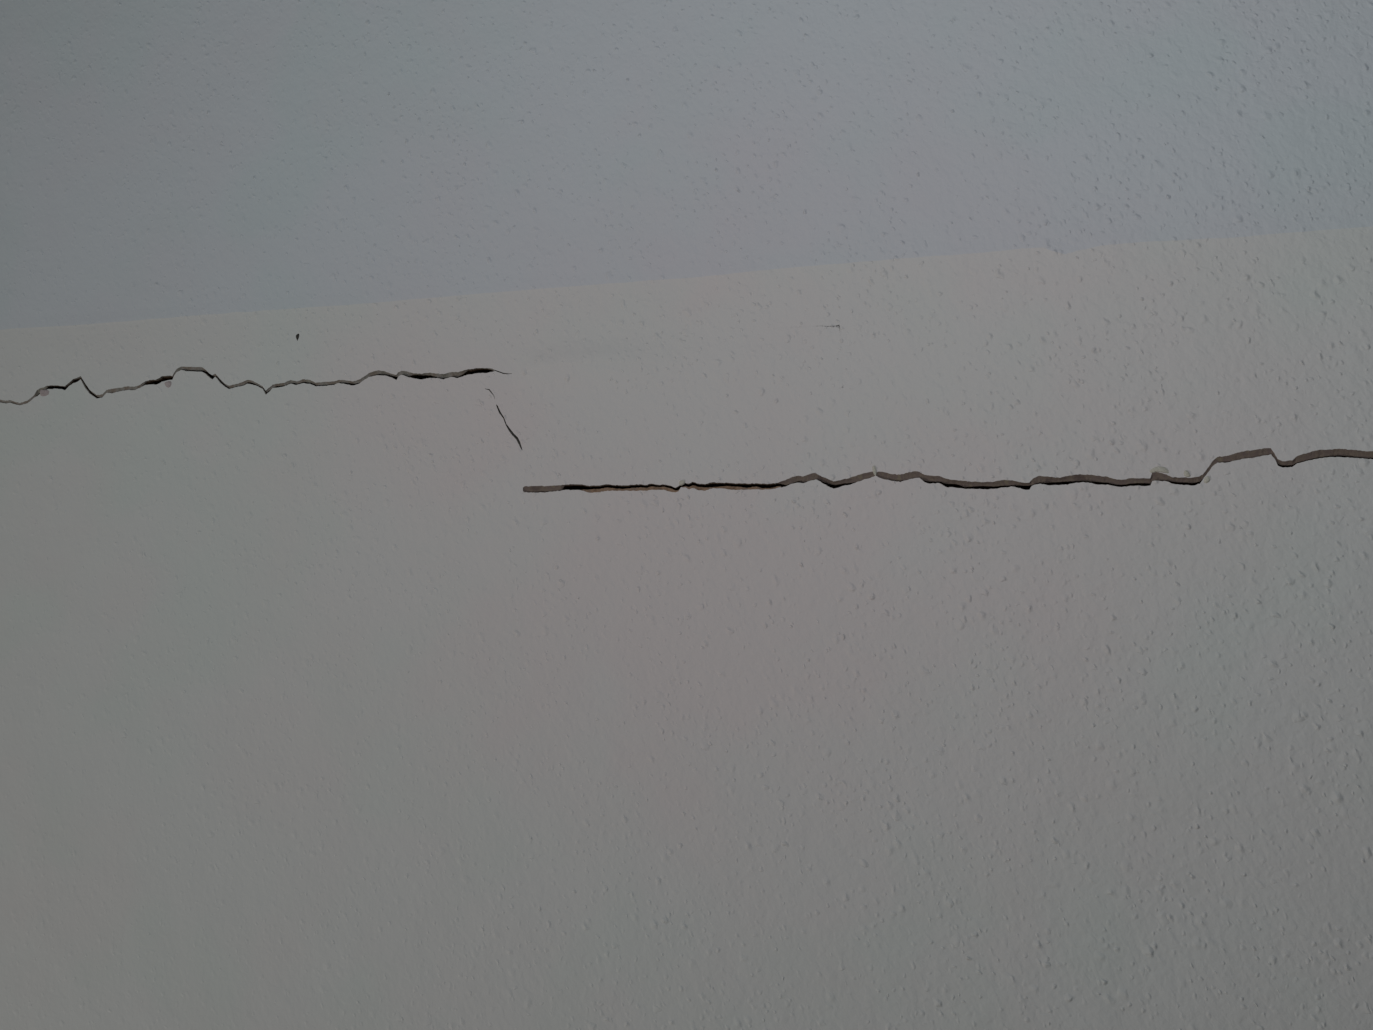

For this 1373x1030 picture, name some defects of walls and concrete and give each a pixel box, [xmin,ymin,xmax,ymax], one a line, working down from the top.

crack [0,367,522,450]
crack [523,448,1373,493]